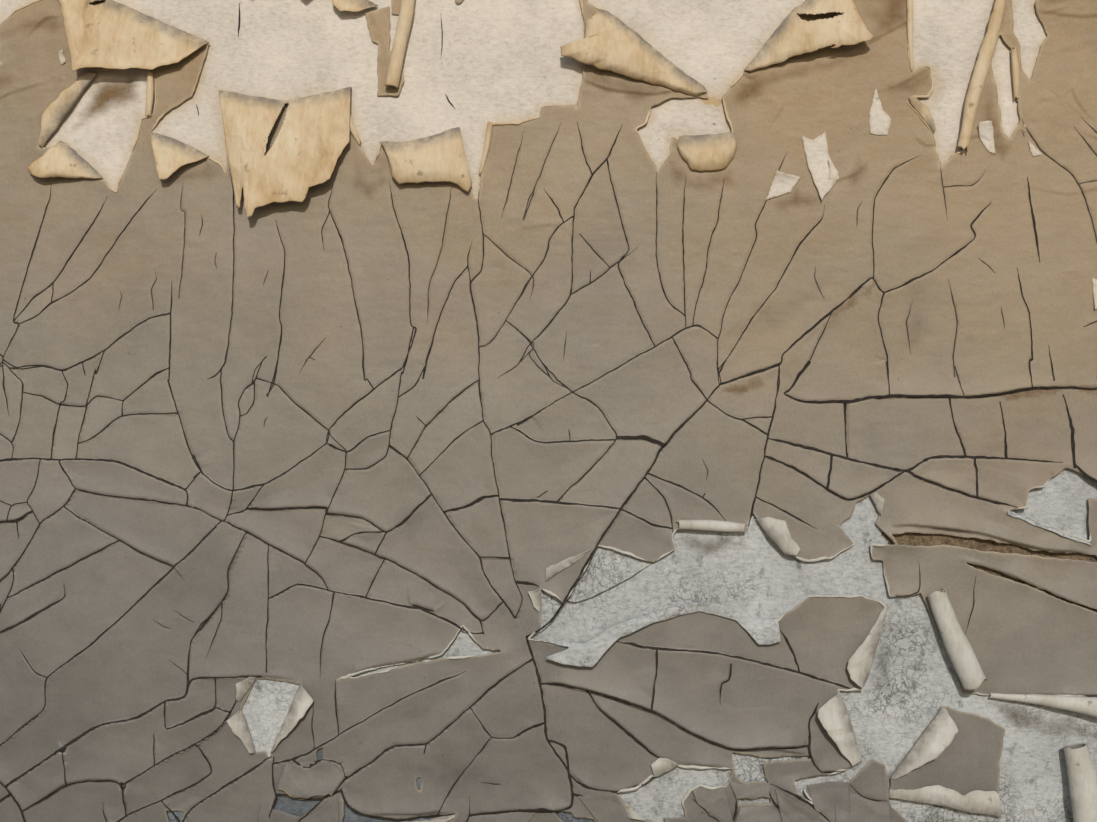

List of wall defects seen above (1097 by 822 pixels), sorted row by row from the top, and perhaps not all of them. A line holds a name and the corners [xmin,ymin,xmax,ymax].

peeling [0,0,41,24]
peeling [27,0,874,218]
peeling [869,89,891,135]
peeling [906,0,1047,166]
crack [238,117,1097,635]
crack [0,170,471,822]
peeling [1007,468,1097,545]
peeling [227,677,313,757]
peeling [337,625,501,680]
crack [182,627,851,822]
peeling [528,492,1097,822]